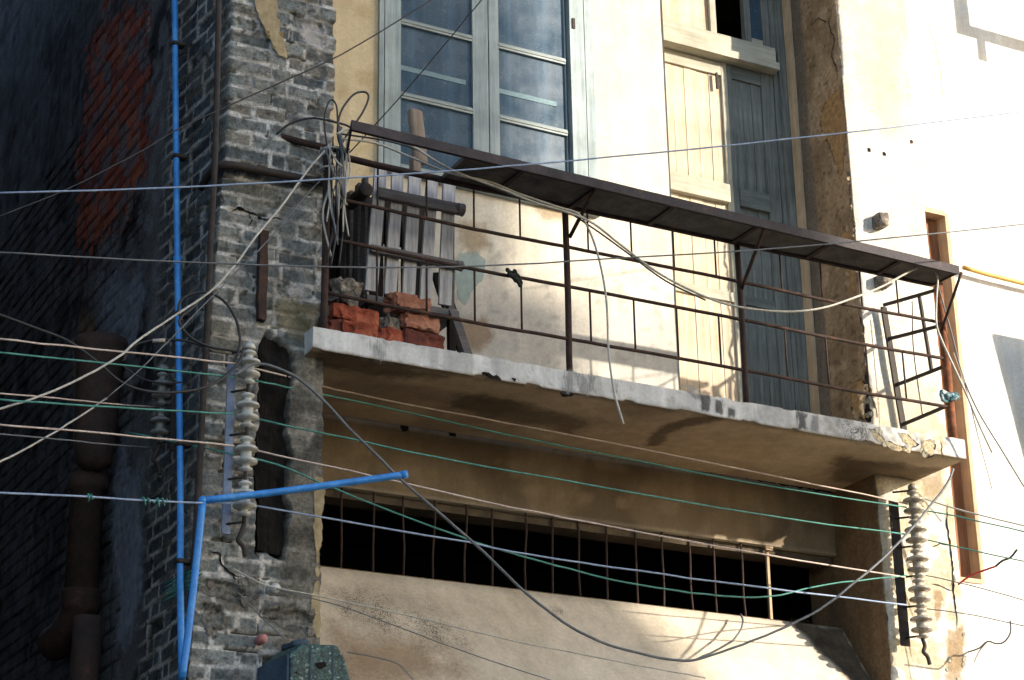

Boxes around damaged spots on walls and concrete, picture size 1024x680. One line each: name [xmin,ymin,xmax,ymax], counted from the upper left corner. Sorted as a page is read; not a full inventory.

crack [812,12,837,69]
peeling [64,0,159,286]
crack [230,206,282,226]
peeling [455,251,486,305]
spalling [845,269,936,459]